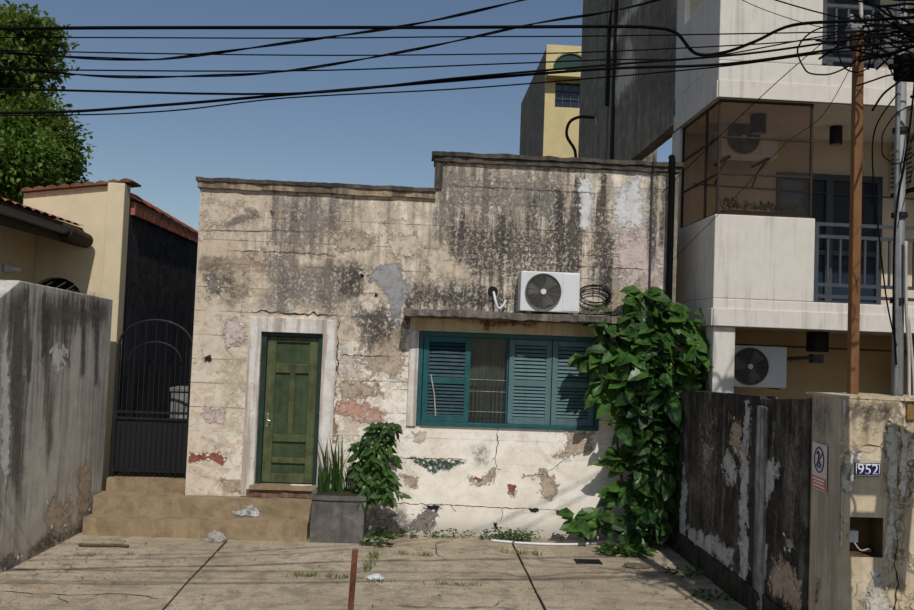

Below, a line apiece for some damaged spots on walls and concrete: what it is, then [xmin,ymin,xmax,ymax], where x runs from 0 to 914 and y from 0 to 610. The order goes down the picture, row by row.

damp [129,193,367,323]
damp [405,162,626,328]
damp [352,306,393,348]
damp [9,288,108,494]
peeling [188,451,241,494]
peeling [399,456,496,489]
peeling [507,468,560,514]
peeling [550,430,595,460]
peeling [679,400,752,581]
peeling [883,413,914,562]
damp [28,527,83,560]
peeling [764,532,808,610]